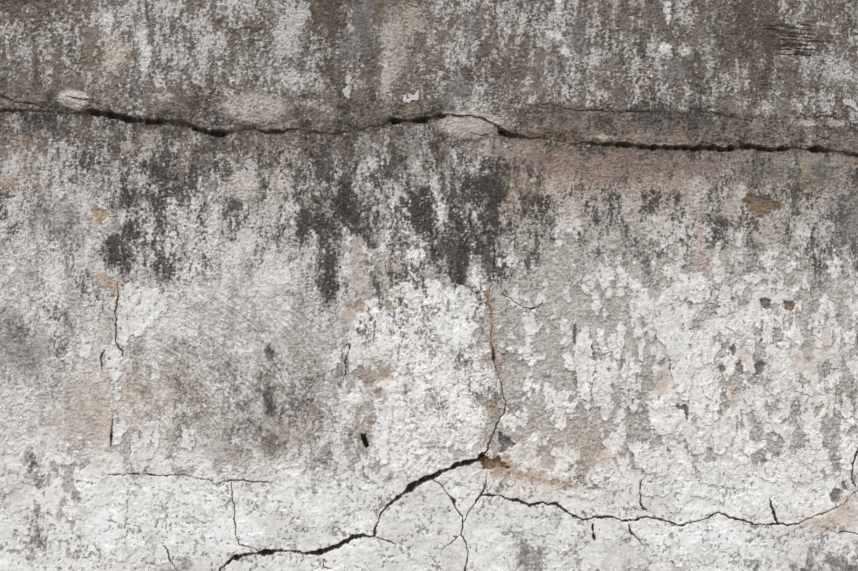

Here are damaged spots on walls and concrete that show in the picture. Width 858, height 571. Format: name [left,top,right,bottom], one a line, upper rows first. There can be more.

damp [133,20,153,79]
damp [544,0,573,57]
crack [0,94,858,157]
damp [88,131,178,279]
damp [293,178,379,311]
damp [402,158,555,285]
crack [100,281,124,368]
peeling [573,317,627,402]
peeling [650,271,743,435]
crack [107,240,858,571]
spalling [481,432,516,470]
peeling [627,442,673,476]